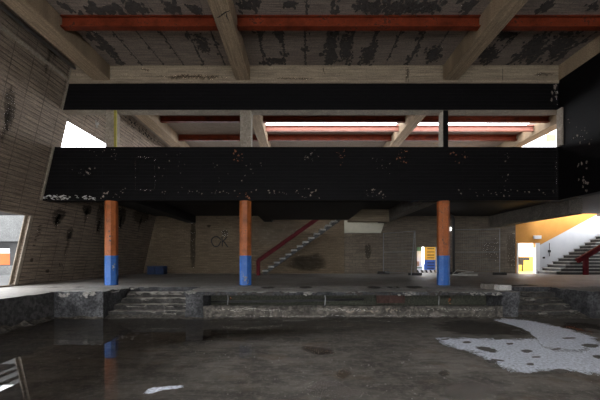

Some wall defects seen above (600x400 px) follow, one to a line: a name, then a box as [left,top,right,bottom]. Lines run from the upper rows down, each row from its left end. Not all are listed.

damp [1,89,15,139]
damp [83,206,104,232]